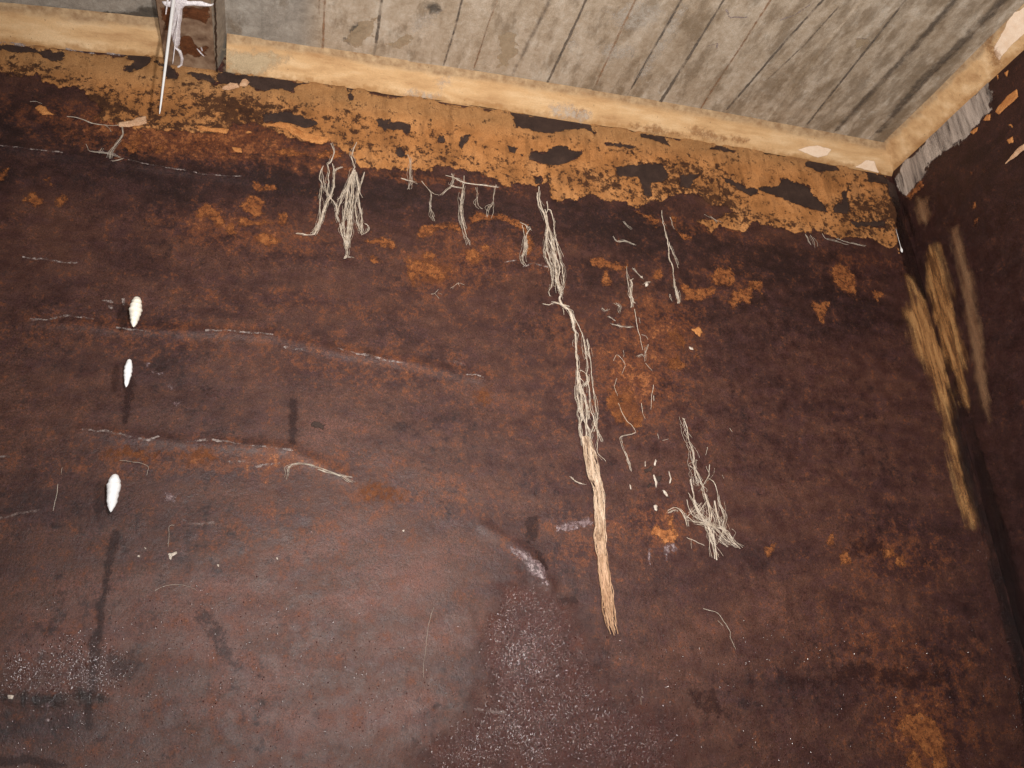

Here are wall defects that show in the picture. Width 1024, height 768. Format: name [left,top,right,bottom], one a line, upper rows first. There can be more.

peeling [344,17,378,48]
peeling [497,32,519,68]
flaking render [0,42,1018,256]
peeling [403,251,445,280]
water stain [894,199,926,299]
rust [918,201,929,221]
rust [906,229,987,526]
water stain [0,388,1024,768]